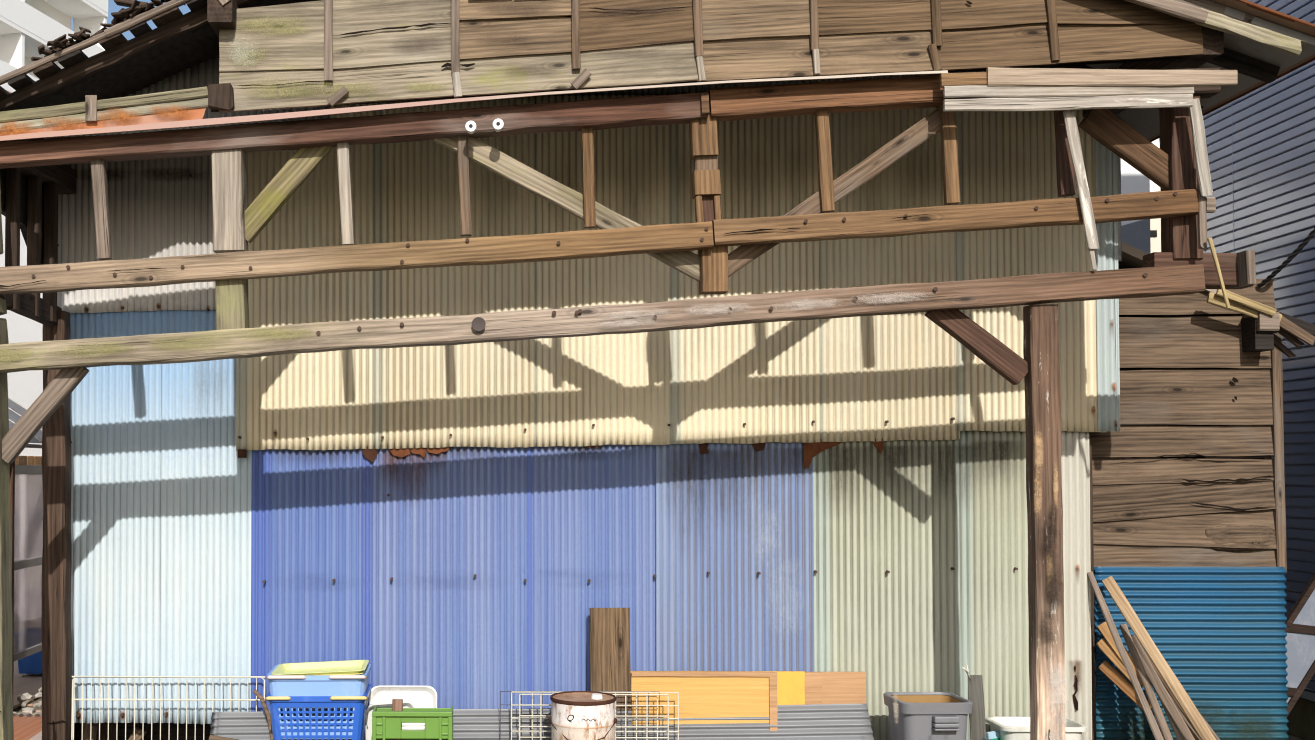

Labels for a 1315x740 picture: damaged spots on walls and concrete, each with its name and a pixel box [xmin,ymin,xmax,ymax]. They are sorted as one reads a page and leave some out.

corrosion [1,122,31,135]